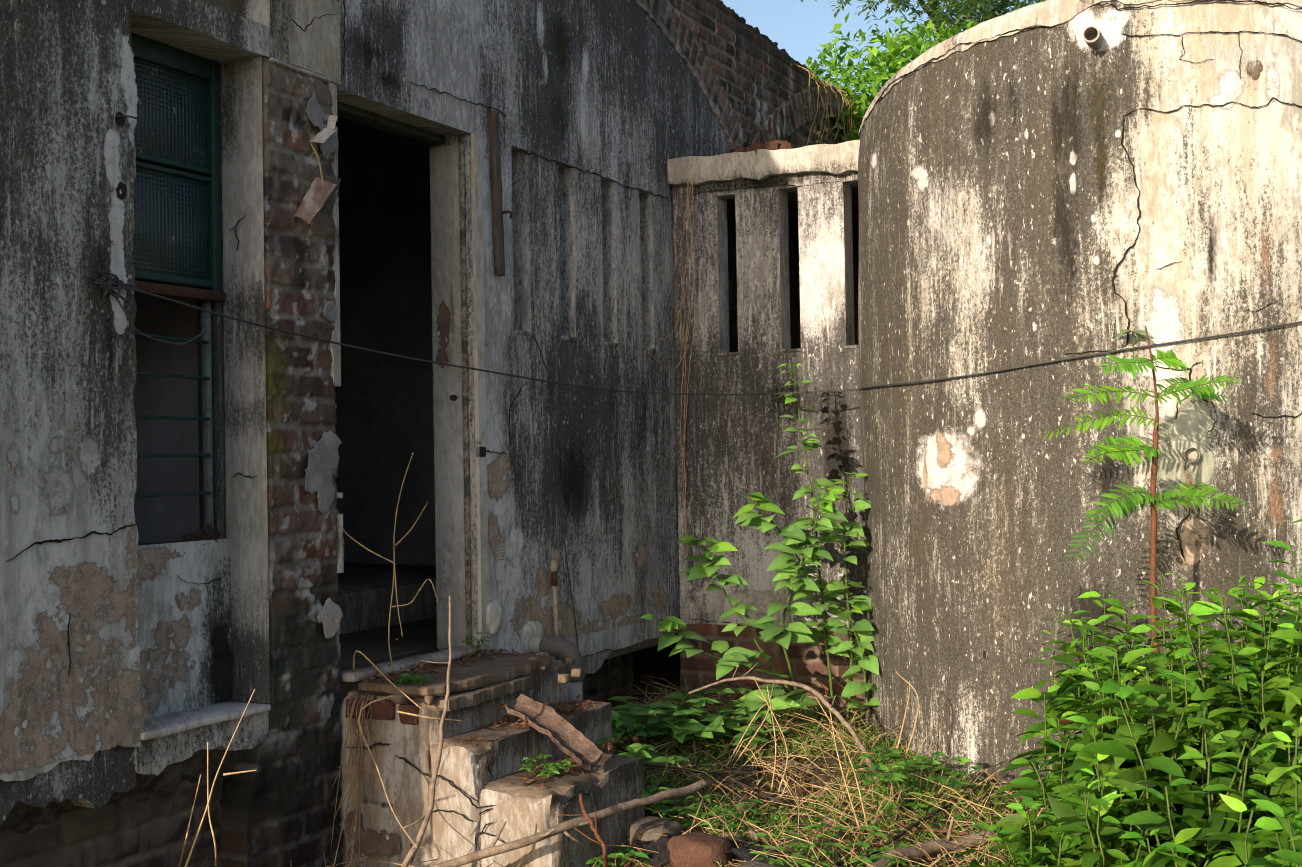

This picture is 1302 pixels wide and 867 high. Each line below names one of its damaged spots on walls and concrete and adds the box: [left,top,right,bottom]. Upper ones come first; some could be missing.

damp [536,2,589,154]
spalling [1068,6,1132,52]
damp [1052,64,1111,203]
crack [1065,0,1302,354]
damp [1208,220,1216,292]
crack [1155,362,1218,433]
spalling [916,407,986,507]
crack [6,524,136,562]
peeling [0,522,202,774]
damp [1070,574,1113,663]
spalling [105,749,248,806]
crack [347,742,504,850]